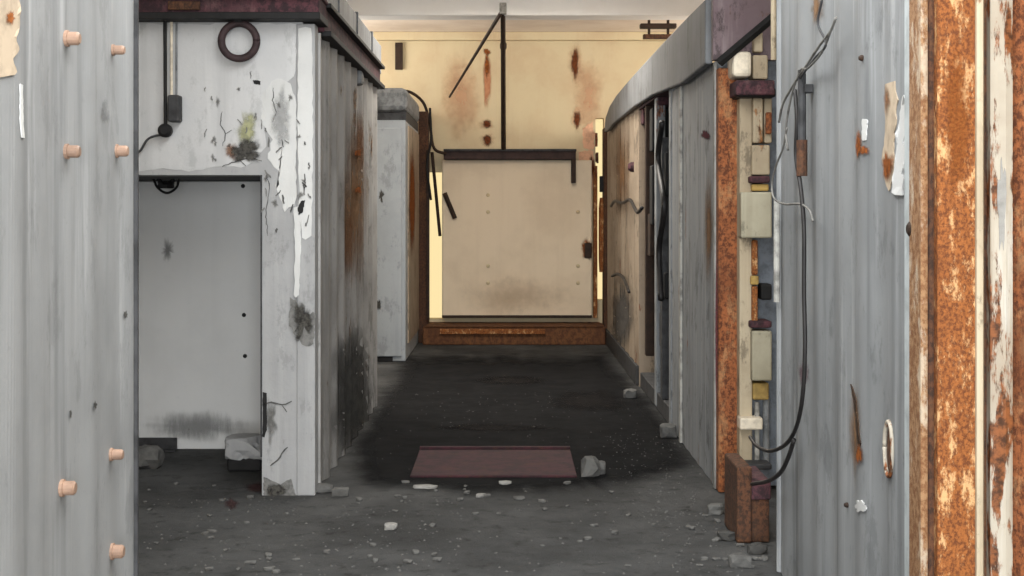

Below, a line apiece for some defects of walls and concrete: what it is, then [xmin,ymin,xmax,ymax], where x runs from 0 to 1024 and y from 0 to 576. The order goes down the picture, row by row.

peeling [0,0,21,77]
peeling [139,23,316,346]
water stain [231,115,259,162]
crack [220,113,270,235]
corrosion [345,119,364,266]
corrosion [855,119,868,157]
peeling [882,81,904,195]
corrosion [934,0,975,576]
water stain [169,418,218,436]
water stain [338,337,369,449]
corrosion [850,384,862,463]